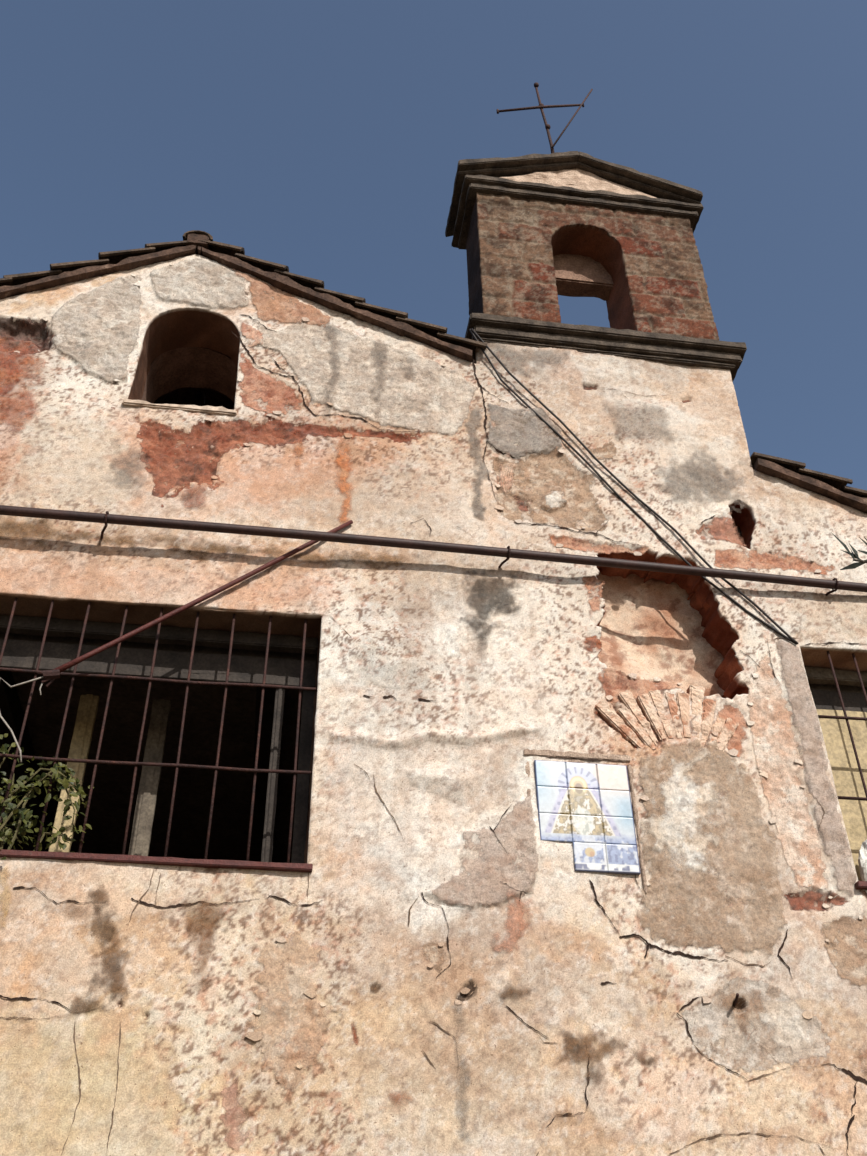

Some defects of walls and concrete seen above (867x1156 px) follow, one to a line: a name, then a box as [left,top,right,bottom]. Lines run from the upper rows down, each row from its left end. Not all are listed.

peeling [0,258,476,507]
crack [232,314,418,432]
spalling [486,404,649,556]
spalling [584,635,602,652]
spalling [582,576,605,611]
spalling [598,668,685,703]
leakage [73,889,127,1012]
crack [13,870,322,922]
peeling [432,796,538,951]
peeling [637,639,867,986]
crack [0,995,121,1155]
crack [670,996,867,1156]